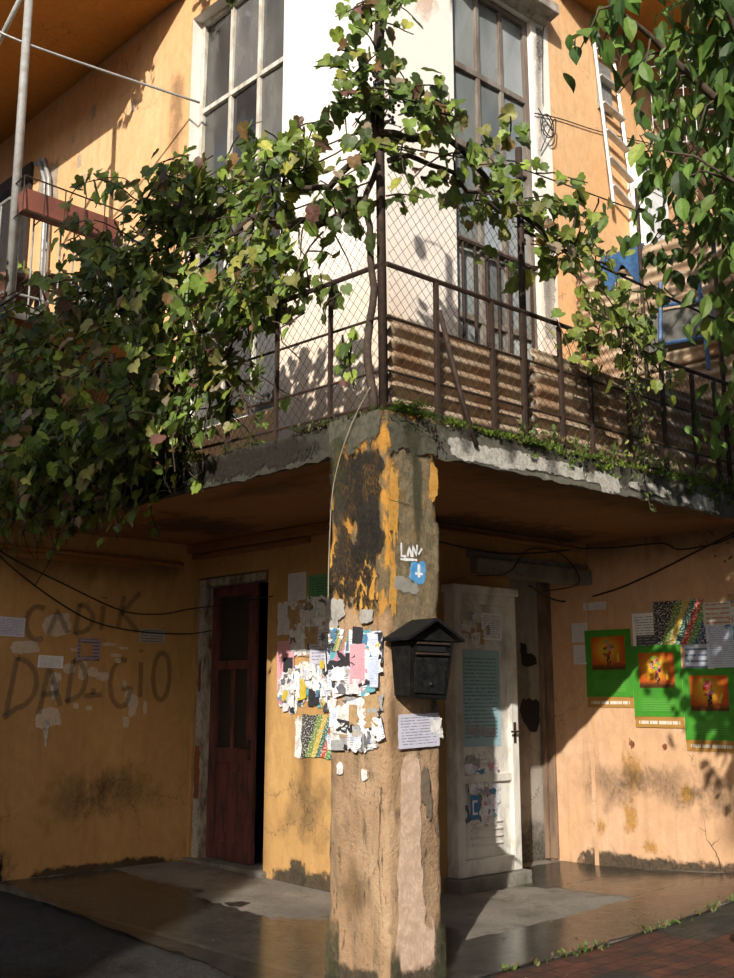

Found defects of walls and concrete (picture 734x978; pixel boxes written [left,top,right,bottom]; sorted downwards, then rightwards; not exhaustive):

peeling [277,408,720,753]
leakage [0,856,377,978]
leakage [390,824,734,978]